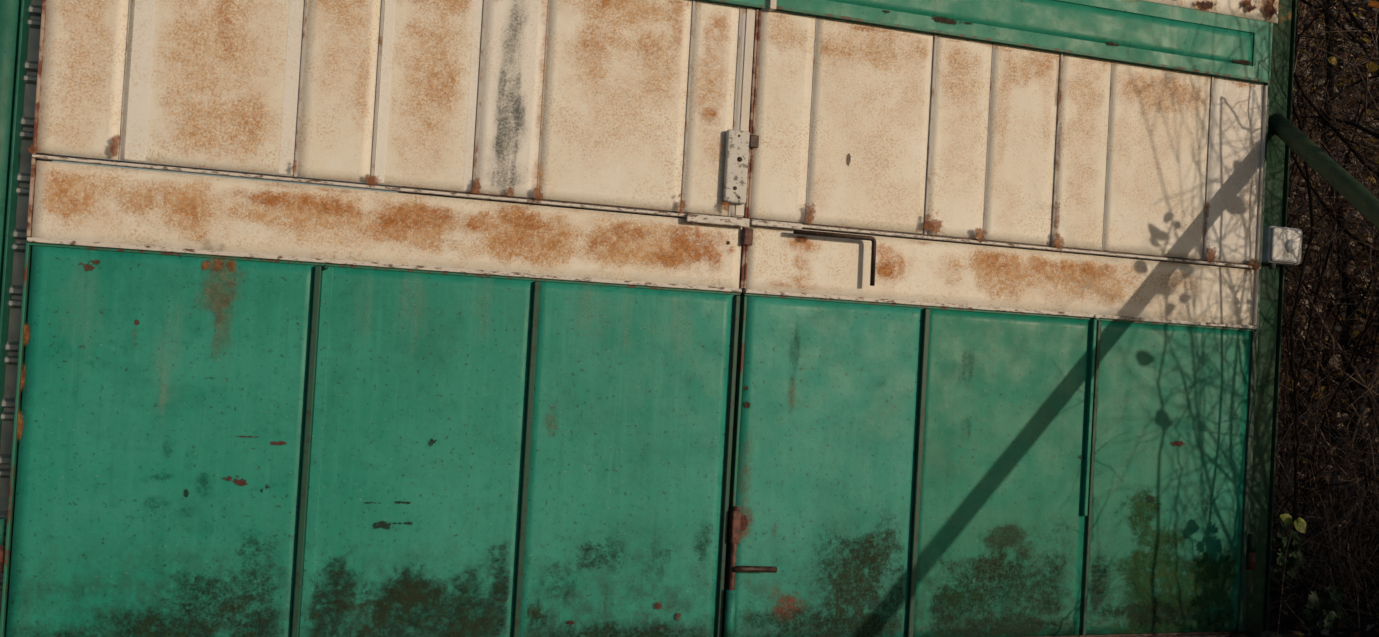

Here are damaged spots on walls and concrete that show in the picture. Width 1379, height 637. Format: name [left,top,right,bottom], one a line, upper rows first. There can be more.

rust [931,16,975,25]
rust [1195,1,1216,10]
rust [1243,0,1290,20]
rust [109,135,121,156]
leakage [493,70,525,188]
rust [365,174,381,187]
rust [43,174,212,239]
rust [231,190,450,251]
rust [470,172,732,268]
rust [790,203,816,249]
rust [923,212,942,234]
rust [949,202,1138,304]